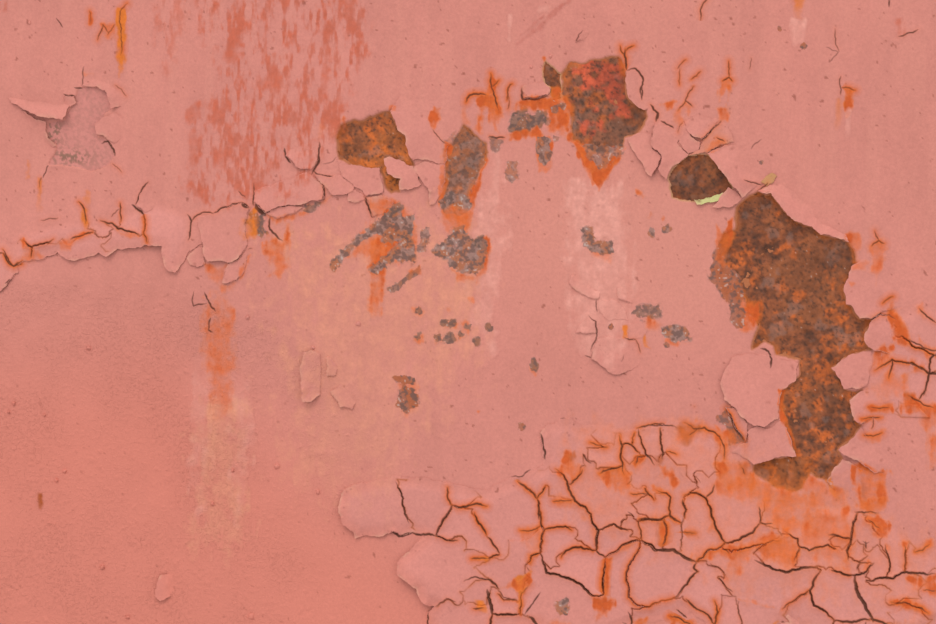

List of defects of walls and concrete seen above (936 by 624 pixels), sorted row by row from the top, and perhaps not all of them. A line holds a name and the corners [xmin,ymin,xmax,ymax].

peeling [8,60,133,183]
peeling [178,0,491,226]
rust [426,105,448,149]
crack [0,115,401,313]
rust [329,201,493,320]
rust [412,306,494,347]
peeling [569,275,693,375]
peeling [669,144,902,491]
rust [392,374,421,419]
crack [338,224,936,624]